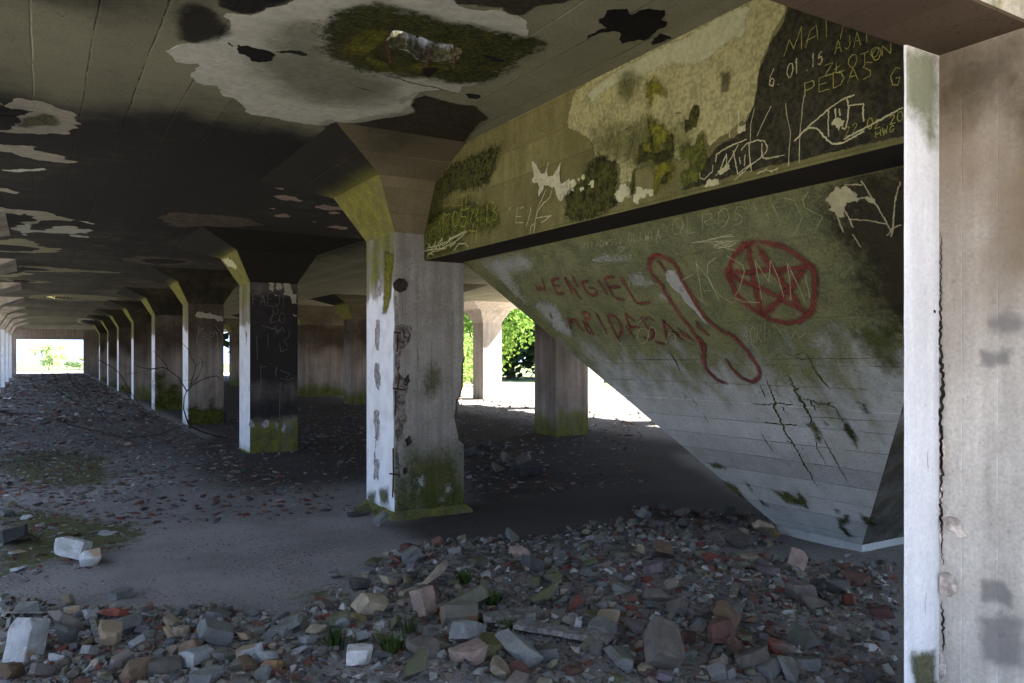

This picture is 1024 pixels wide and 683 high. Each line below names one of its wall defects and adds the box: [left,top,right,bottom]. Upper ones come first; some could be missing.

peeling [0,98,81,172]
peeling [166,0,529,126]
water stain [619,74,674,195]
peeling [567,0,786,204]
spalling [346,278,412,527]
crack [753,352,896,486]
crack [927,233,946,564]
crack [925,593,945,652]